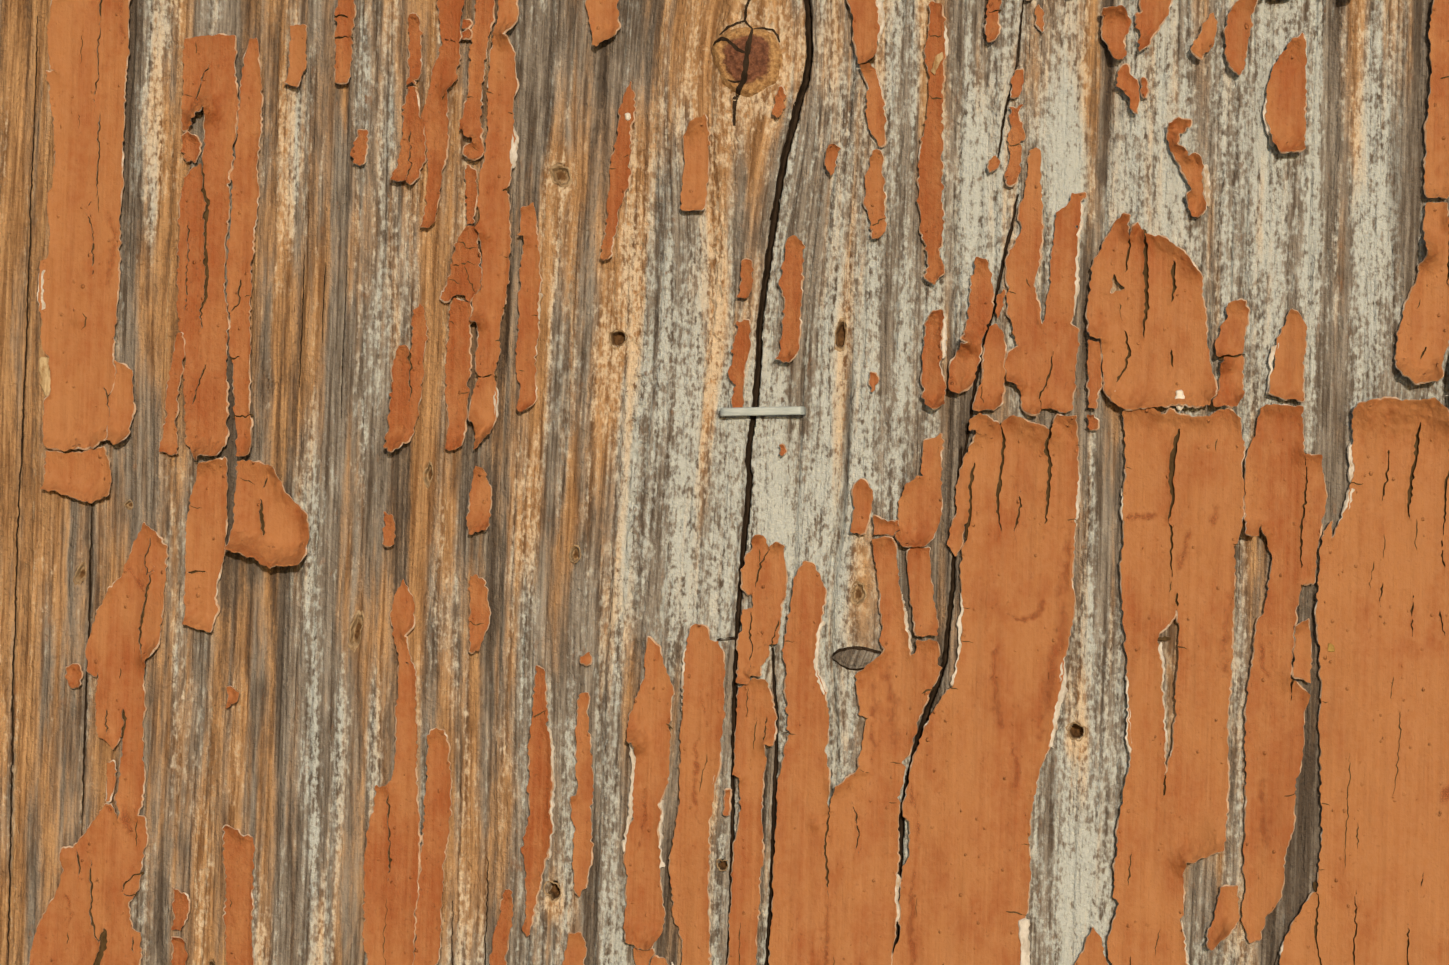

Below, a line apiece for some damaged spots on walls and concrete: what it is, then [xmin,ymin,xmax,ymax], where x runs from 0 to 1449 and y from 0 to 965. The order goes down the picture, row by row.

peeling [28,0,310,965]
peeling [383,304,429,452]
peeling [390,0,543,451]
peeling [466,466,492,535]
peeling [585,0,621,47]
peeling [600,81,637,261]
crack [713,0,813,965]
crack [955,194,1019,514]
crack [997,0,1024,158]
peeling [622,0,1449,965]
peeling [361,579,452,965]
crack [892,554,956,953]